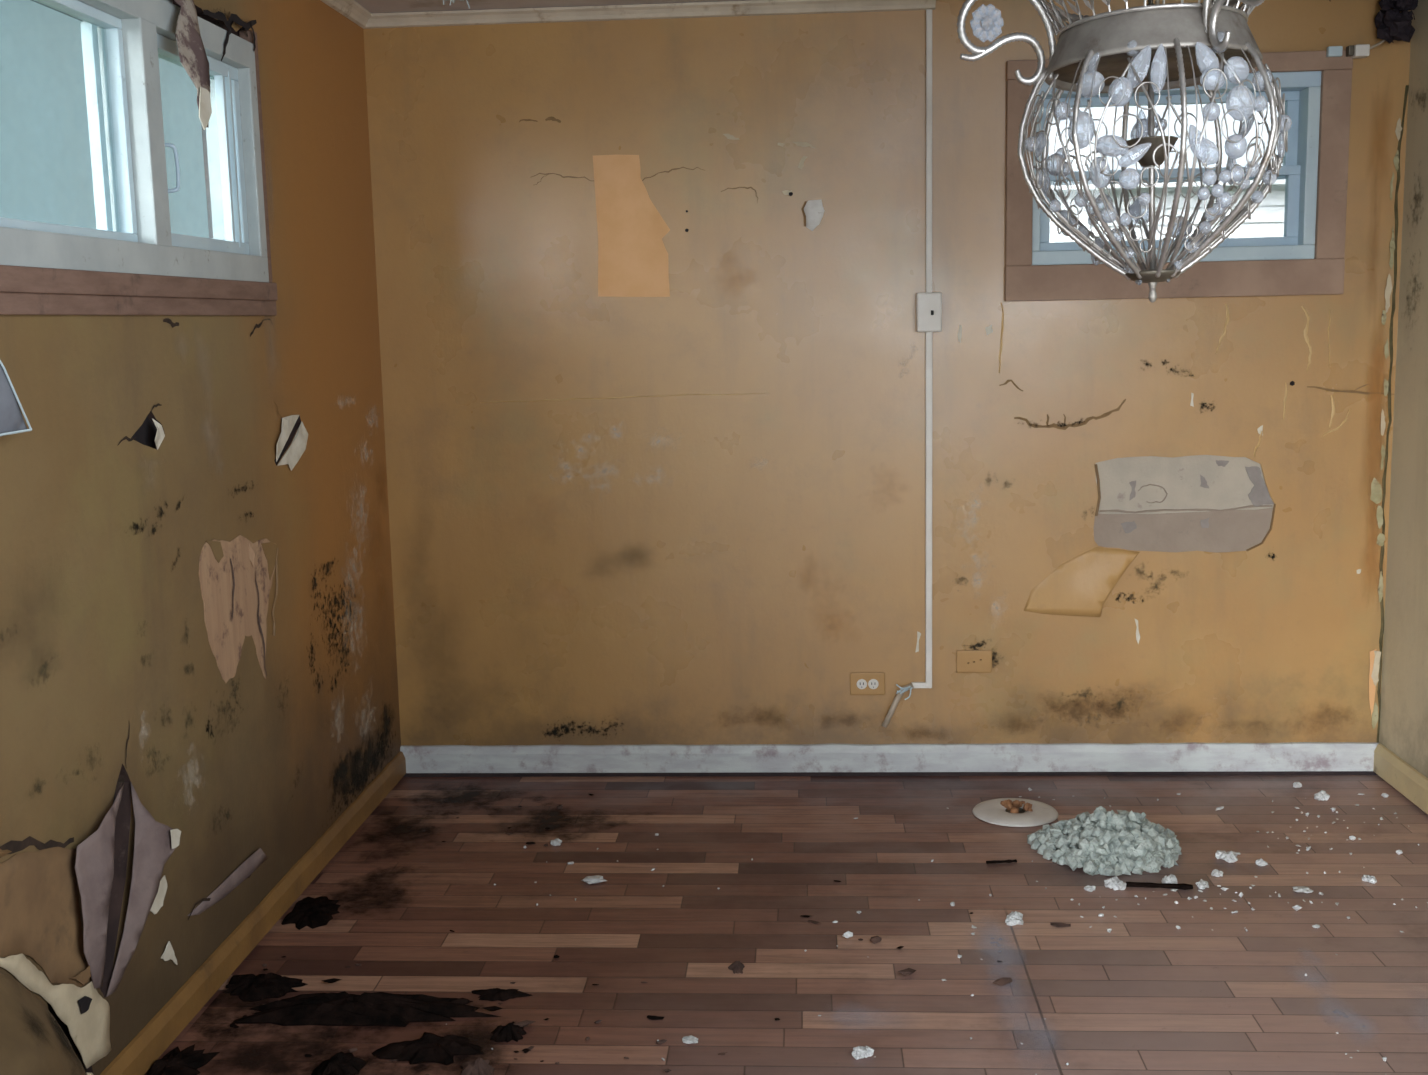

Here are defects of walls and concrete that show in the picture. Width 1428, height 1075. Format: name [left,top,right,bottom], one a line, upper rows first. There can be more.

crack [999,380,1126,430]
spalling [1094,455,1276,553]
peeling [199,535,278,683]
leakage [309,560,357,692]
leakage [333,706,393,812]
leakage [544,721,623,737]
crack [0,836,74,858]
peeling [170,829,181,849]
peeling [0,847,112,1075]